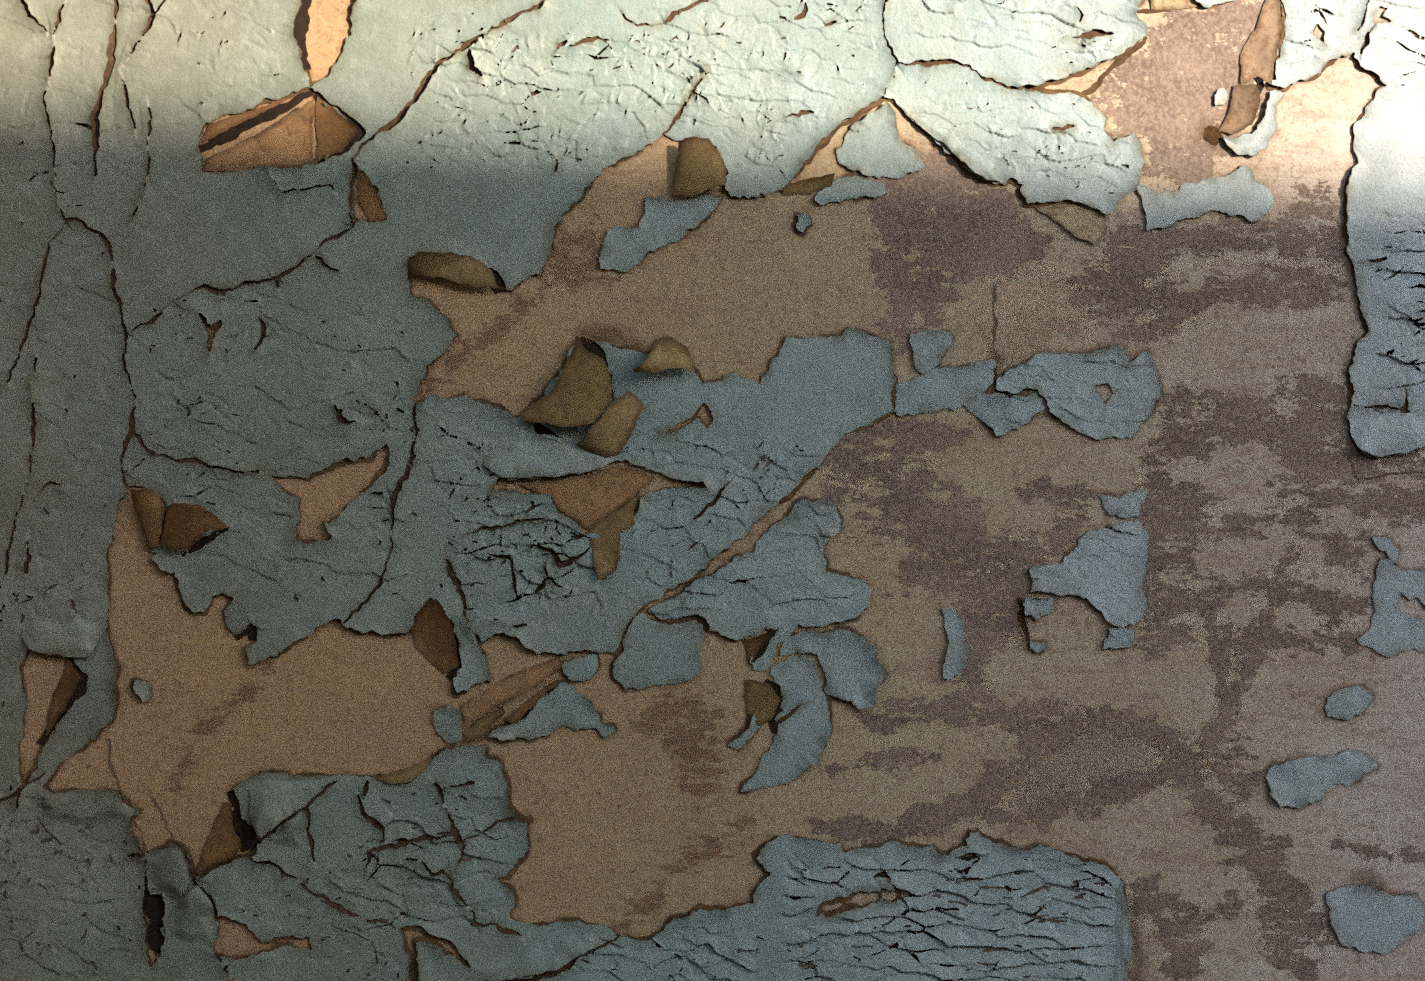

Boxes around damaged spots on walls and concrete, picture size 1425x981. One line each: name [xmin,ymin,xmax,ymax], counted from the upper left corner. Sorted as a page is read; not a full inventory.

peeling [197,0,387,224]
crack [0,0,1171,649]
crack [1367,246,1425,312]
crack [1354,395,1411,413]
peeling [407,0,1425,981]
peeling [43,486,469,876]
crack [0,738,521,978]
peeling [392,916,471,981]
crack [669,936,817,981]
crack [851,916,911,962]
crack [931,870,1112,980]